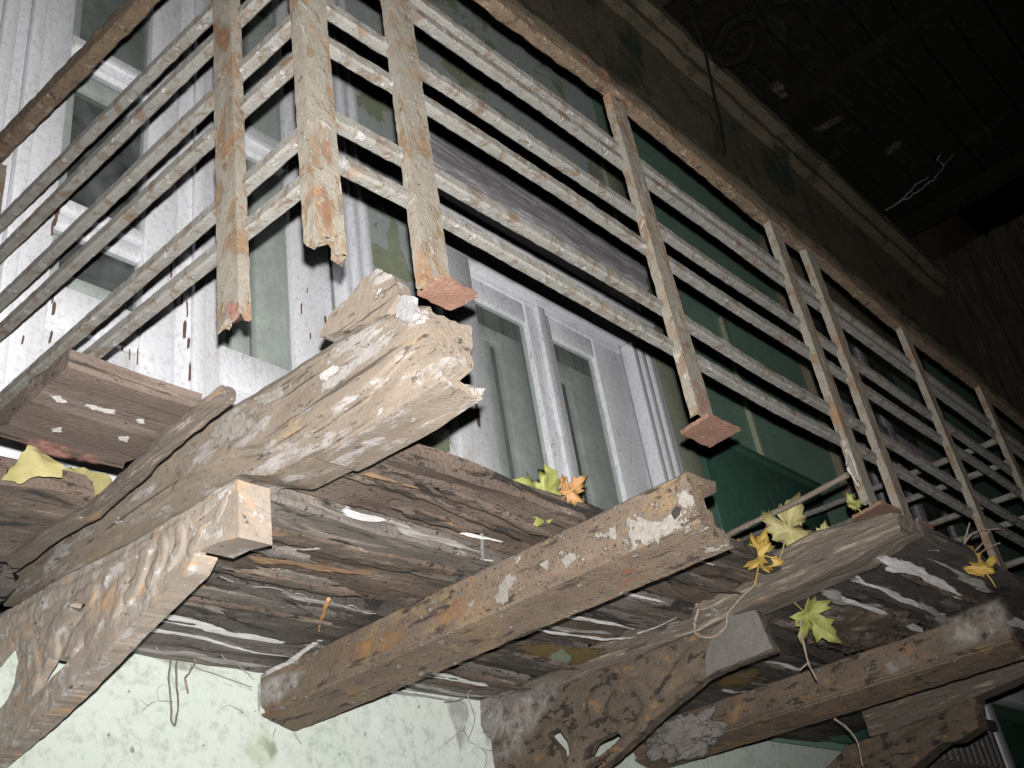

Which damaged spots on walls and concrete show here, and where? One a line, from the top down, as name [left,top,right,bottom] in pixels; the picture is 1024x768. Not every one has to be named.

crack [885,152,953,211]
peeling [319,365,343,382]
peeling [80,402,116,415]
peeling [208,386,286,448]
peeling [609,488,694,552]
peeling [539,551,580,571]
peeling [494,572,517,605]